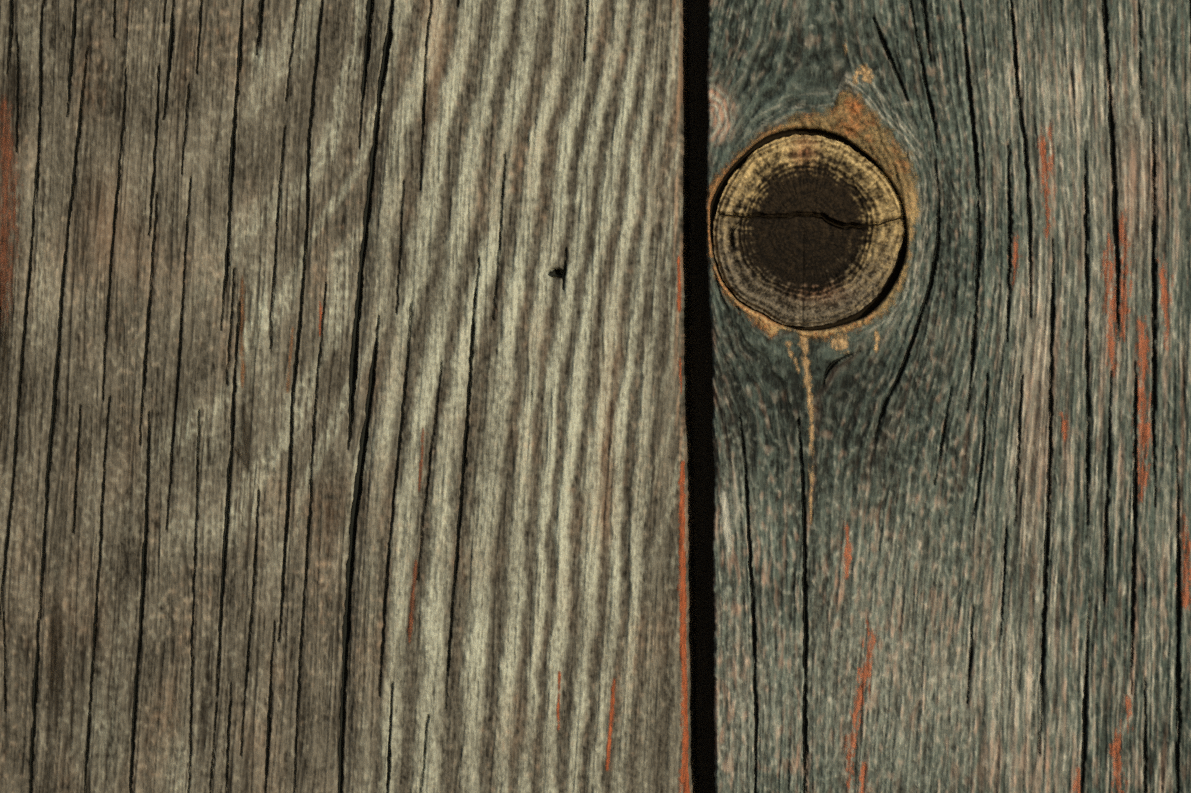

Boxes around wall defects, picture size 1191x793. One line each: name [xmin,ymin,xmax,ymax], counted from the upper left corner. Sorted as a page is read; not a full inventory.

crack [0,0,126,793]
crack [129,0,326,793]
crack [338,0,458,793]
crack [420,155,505,793]
crack [740,419,757,793]
crack [710,129,905,330]
crack [823,351,860,384]
crack [873,0,940,443]